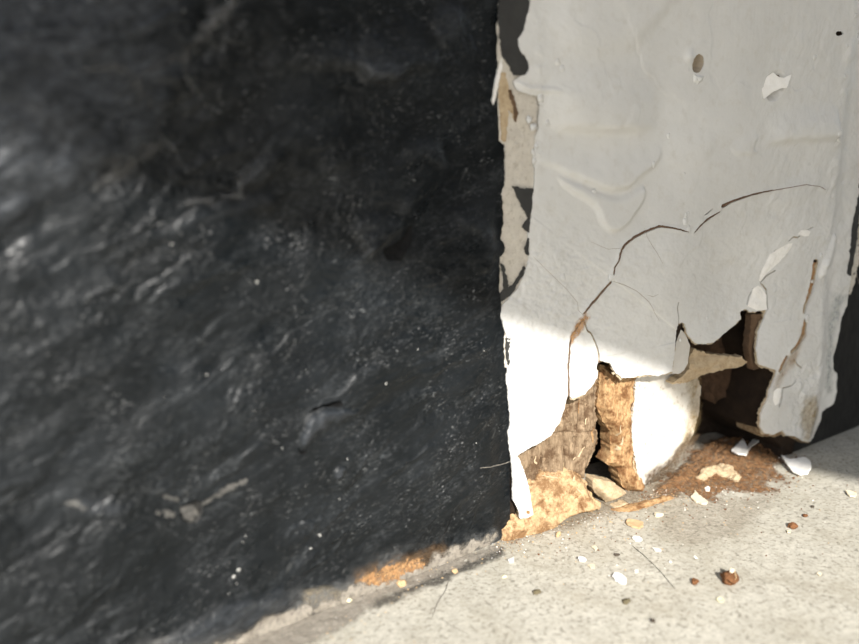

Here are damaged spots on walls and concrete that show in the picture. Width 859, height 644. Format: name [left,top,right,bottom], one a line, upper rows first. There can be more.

peeling [491,58,518,142]
crack [534,184,826,396]
peeling [631,373,701,485]
spalling [731,422,810,456]
peeling [773,388,781,405]
peeling [691,486,710,505]